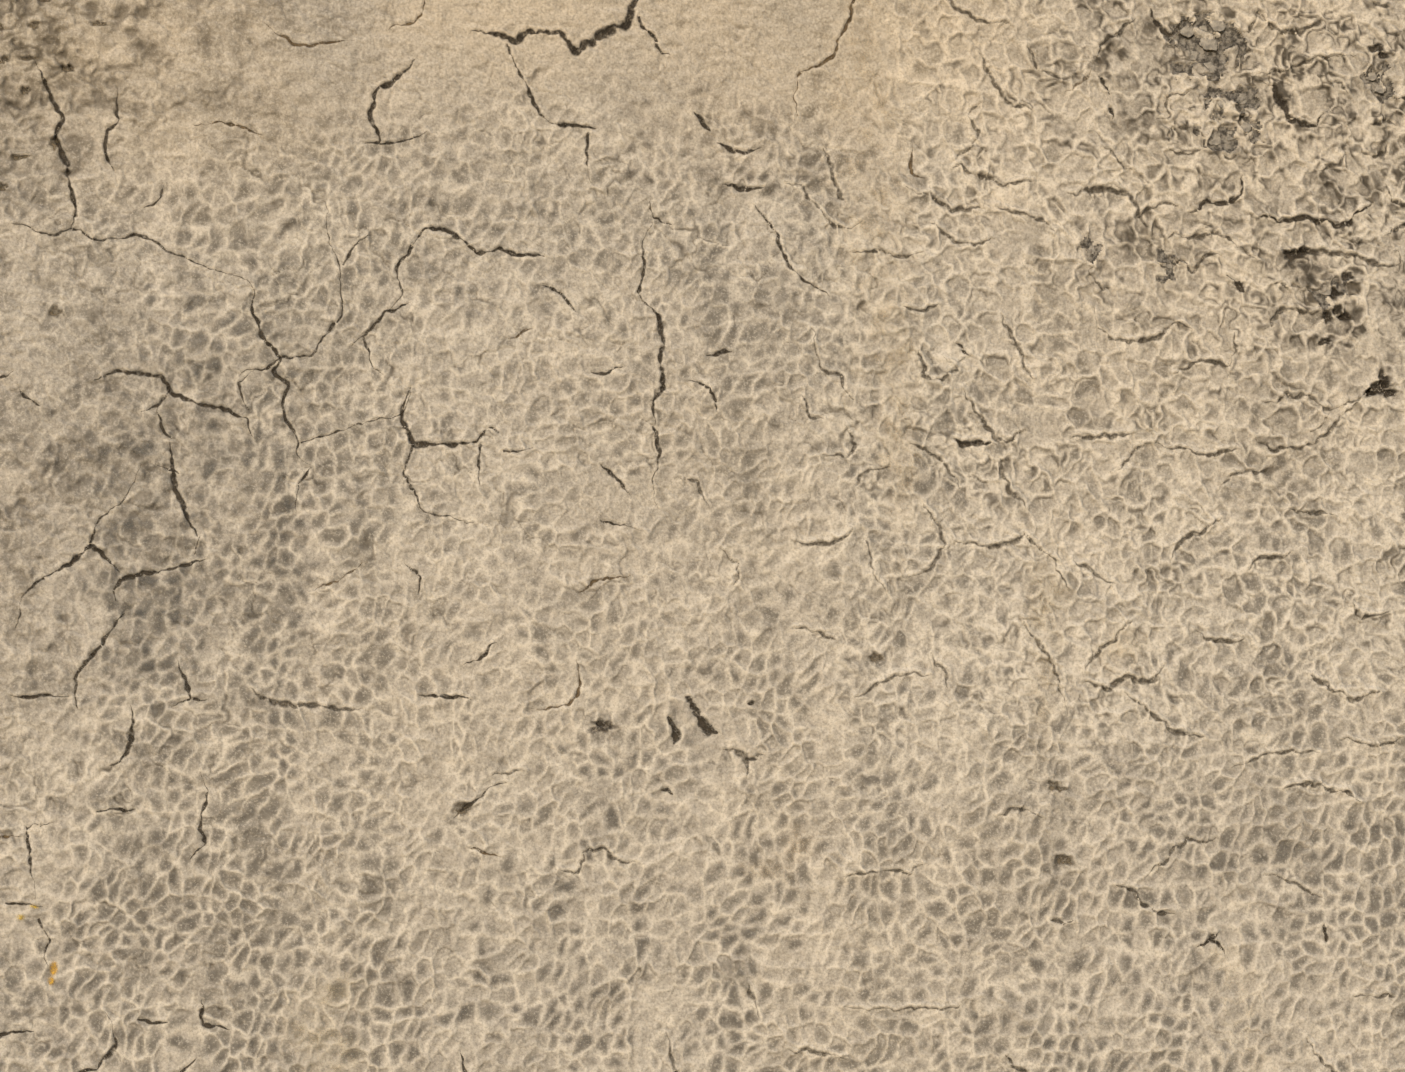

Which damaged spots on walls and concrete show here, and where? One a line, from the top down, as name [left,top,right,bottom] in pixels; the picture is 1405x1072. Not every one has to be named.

crack [388,1,425,30]
crack [472,0,669,167]
crack [793,0,855,116]
crack [0,371,39,406]
crack [15,56,581,711]
crack [592,367,621,376]
crack [600,201,732,527]
crack [79,999,227,1072]